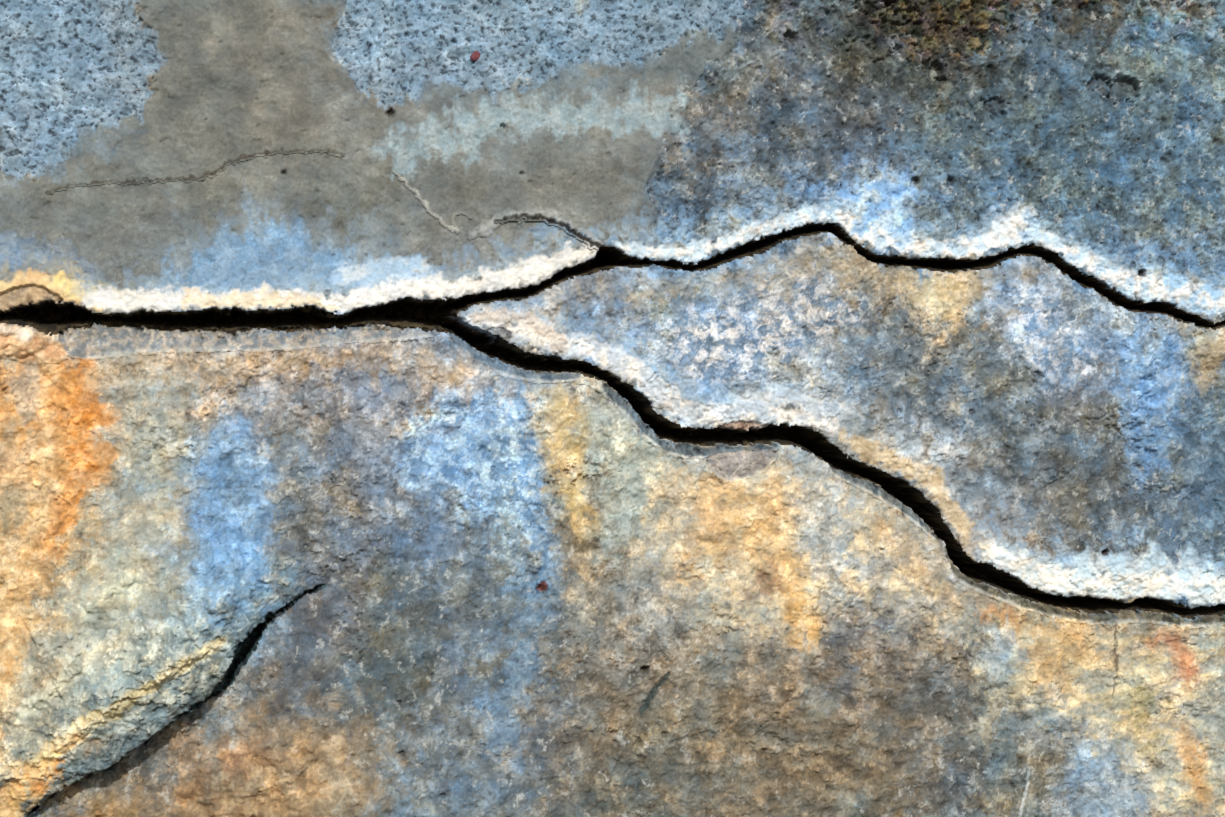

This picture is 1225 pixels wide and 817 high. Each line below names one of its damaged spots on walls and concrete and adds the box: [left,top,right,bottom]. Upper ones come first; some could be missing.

crack [45,146,345,194]
crack [647,144,666,225]
crack [0,170,1225,697]
crack [165,584,326,727]
crack [638,672,671,716]